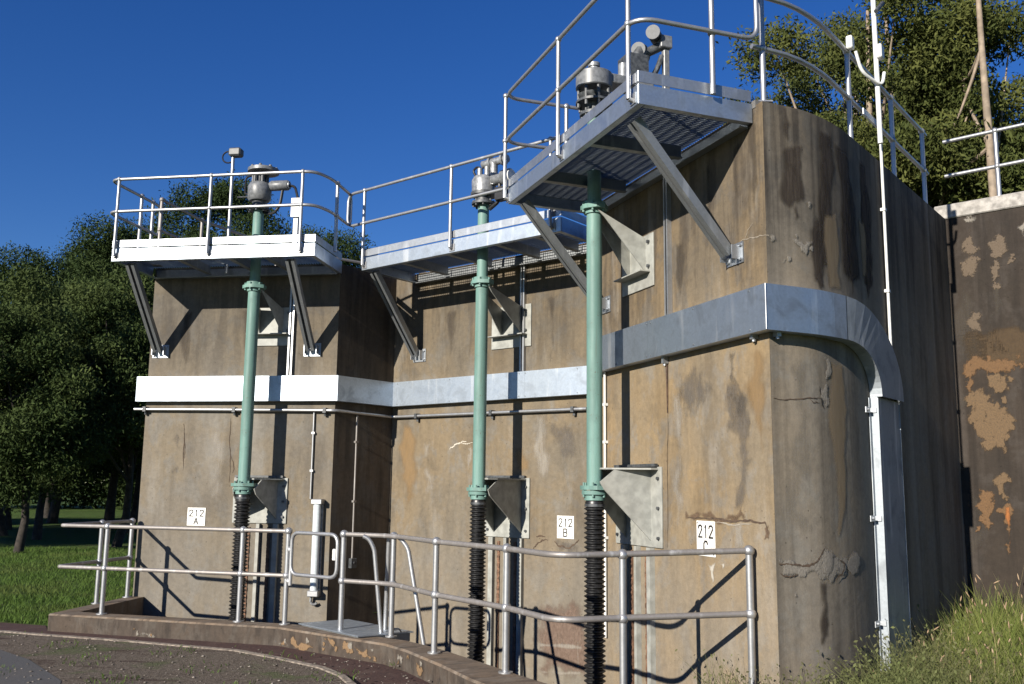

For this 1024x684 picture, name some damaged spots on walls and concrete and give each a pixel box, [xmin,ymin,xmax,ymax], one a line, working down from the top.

damp [782,119,804,217]
damp [812,132,873,297]
peeling [967,312,982,332]
damp [727,374,750,506]
peeling [963,355,1024,454]
crack [685,510,768,534]
peeling [975,472,1012,532]
peeling [279,636,376,662]